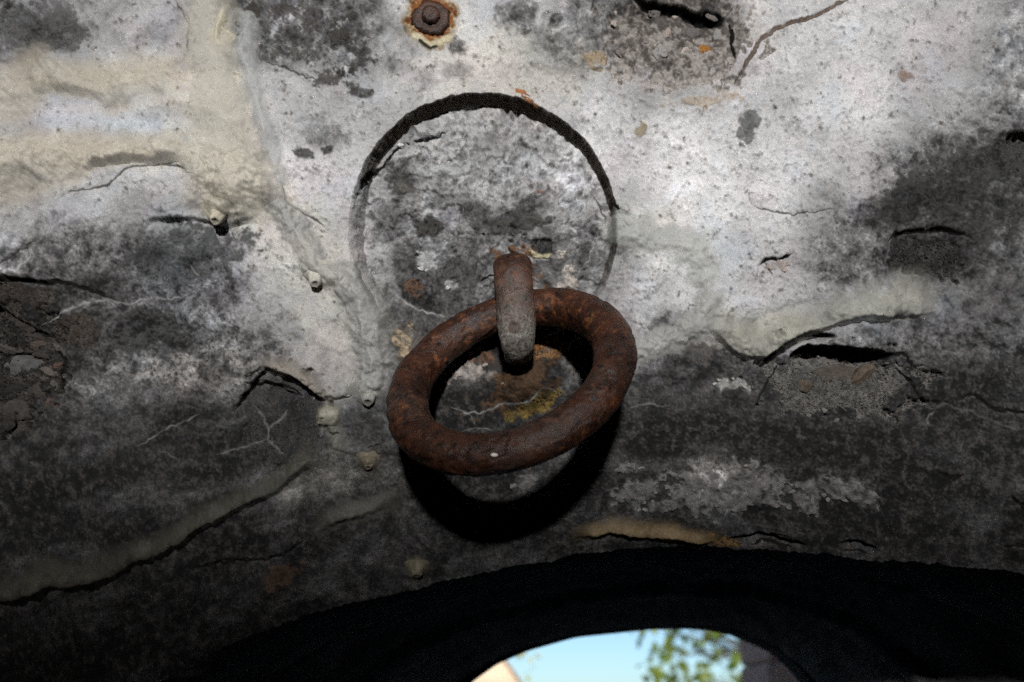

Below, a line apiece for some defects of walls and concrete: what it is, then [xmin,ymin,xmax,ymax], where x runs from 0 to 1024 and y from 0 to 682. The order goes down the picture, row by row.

corrosion [403,0,459,49]
spalling [591,0,775,94]
crack [728,0,847,85]
crack [70,163,191,191]
crack [354,131,447,204]
water stain [137,214,261,286]
crack [888,226,970,242]
water stain [110,308,198,356]
crack [235,366,351,410]
corrosion [392,325,412,356]
corrosion [461,330,570,423]
spalling [713,333,944,425]